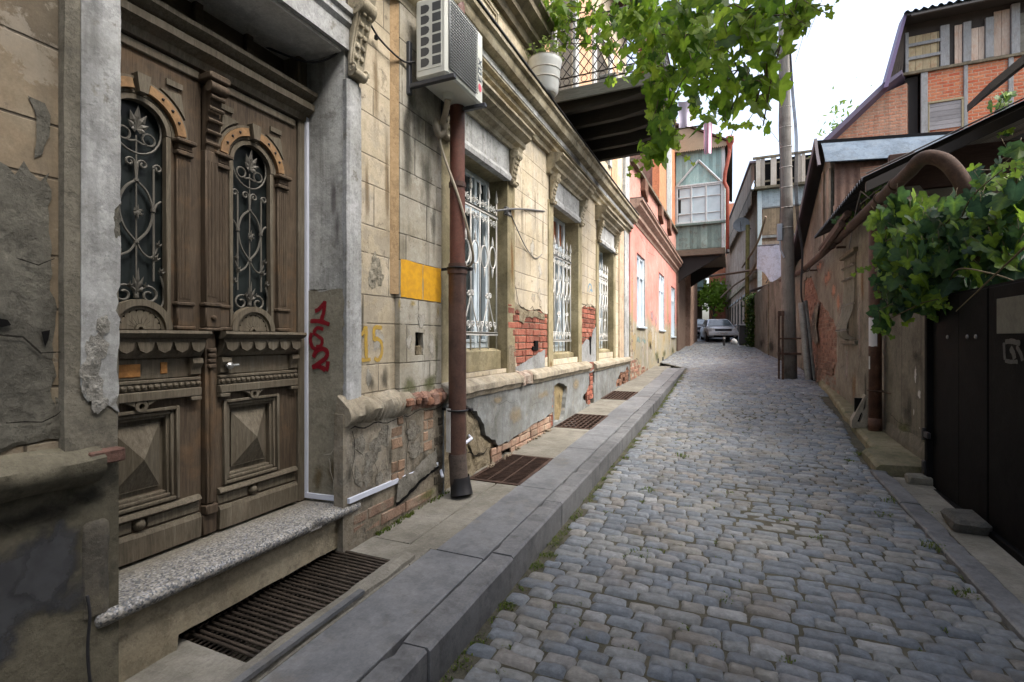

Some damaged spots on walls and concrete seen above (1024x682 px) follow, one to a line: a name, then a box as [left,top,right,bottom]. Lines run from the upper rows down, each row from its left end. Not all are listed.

spalling [0,96,60,453]
spalling [79,315,111,414]
flaking render [508,289,548,366]
flaking render [582,306,595,405]
flaking render [804,262,839,394]
peeling [352,407,450,533]
spalling [466,383,563,476]